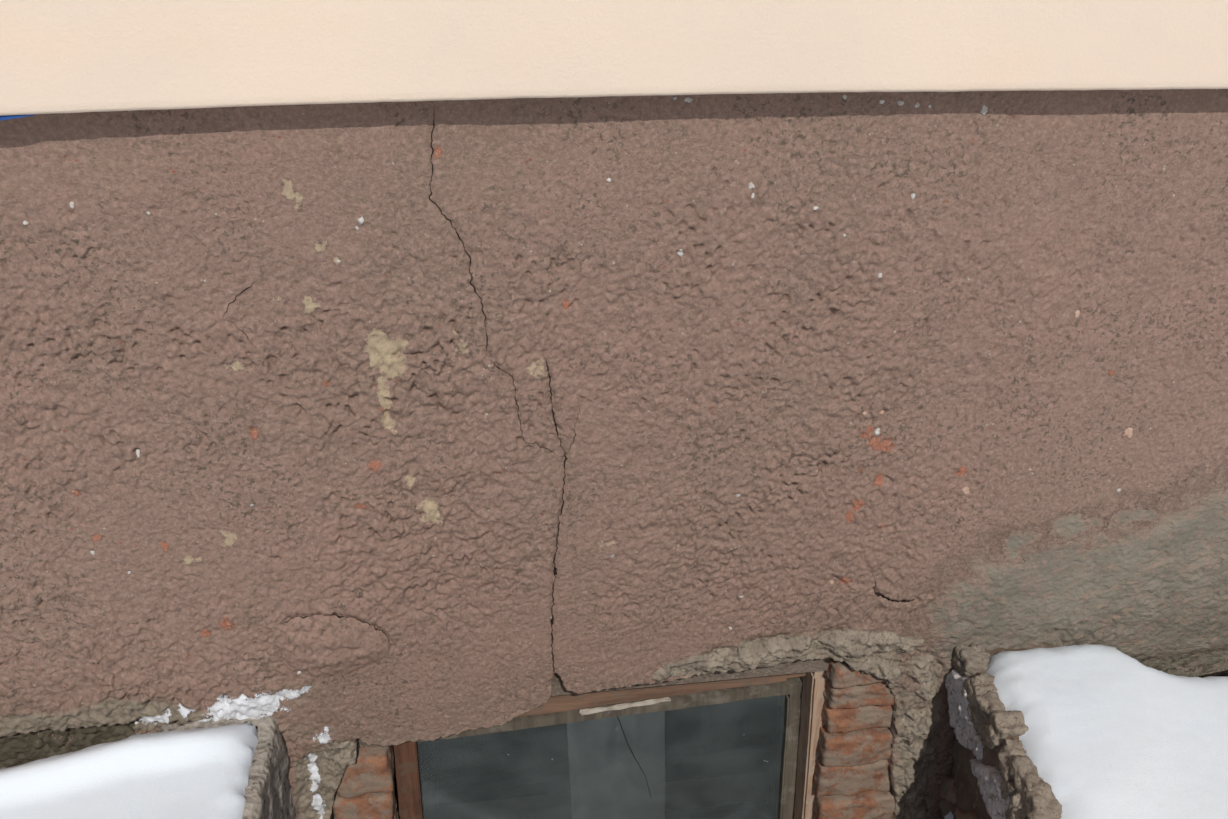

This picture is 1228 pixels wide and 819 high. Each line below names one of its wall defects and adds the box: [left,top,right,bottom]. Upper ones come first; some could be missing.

crack [429,107,582,676]
spalling [858,410,895,452]
crack [873,582,914,603]
flaking render [653,448,1228,819]
damp [1136,647,1228,677]